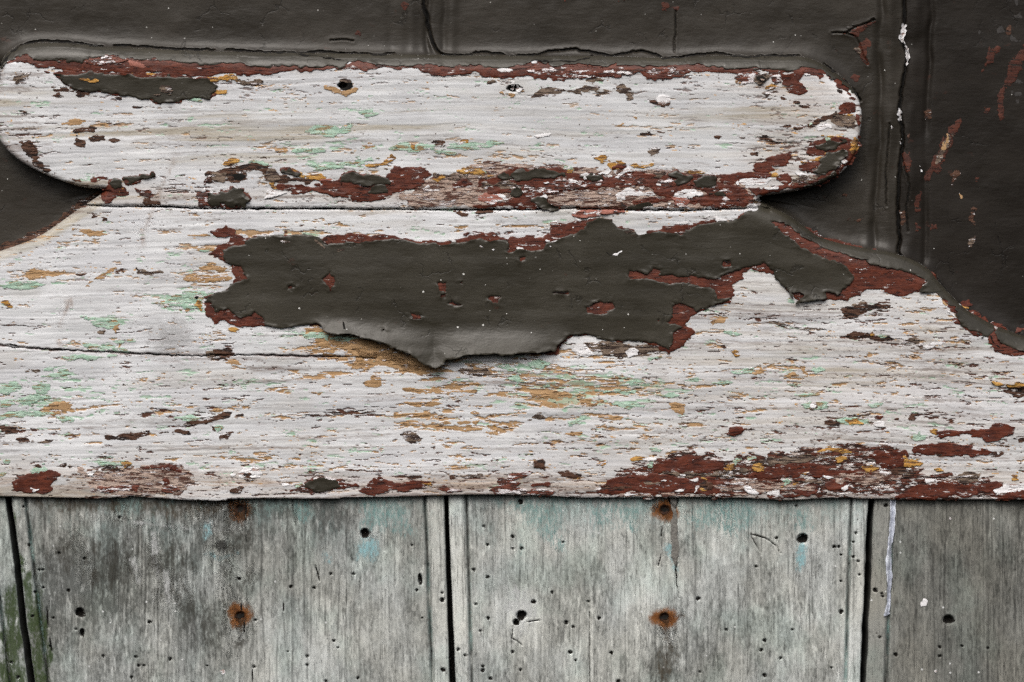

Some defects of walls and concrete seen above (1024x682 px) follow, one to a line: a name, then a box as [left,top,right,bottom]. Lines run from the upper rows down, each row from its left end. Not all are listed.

crack [422,0,798,62]
crack [824,64,861,101]
peeling [0,43,1024,444]
crack [1,324,362,358]
peeling [595,392,1024,501]
peeling [0,459,195,497]
peeling [230,466,262,493]
peeling [281,469,483,496]
peeling [490,470,582,497]
rust [652,498,678,521]
rust [228,602,252,627]
rust [649,609,682,628]